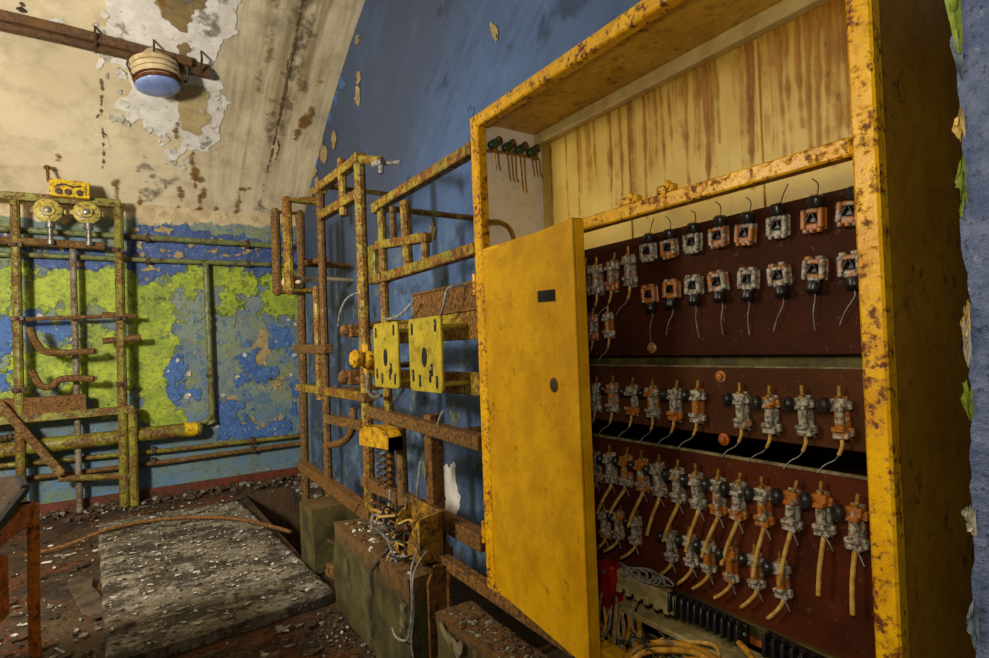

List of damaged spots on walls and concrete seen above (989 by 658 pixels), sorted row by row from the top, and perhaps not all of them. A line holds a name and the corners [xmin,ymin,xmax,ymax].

flaking render [91,0,242,170]
corrosion [177,152,218,211]
peeling [308,71,361,197]
peeling [489,22,498,42]
peeling [0,222,307,446]
flaking render [444,462,461,515]